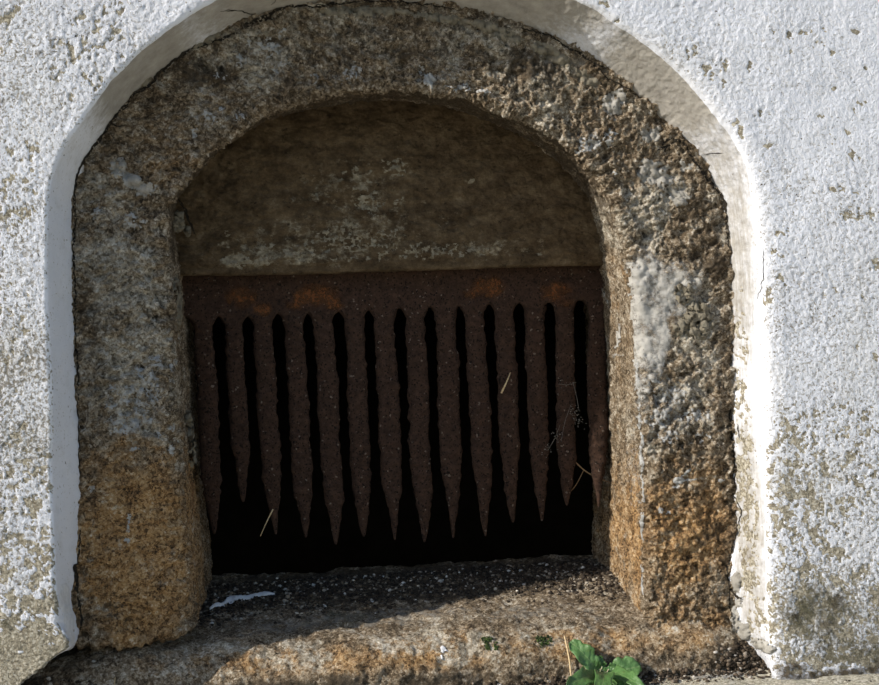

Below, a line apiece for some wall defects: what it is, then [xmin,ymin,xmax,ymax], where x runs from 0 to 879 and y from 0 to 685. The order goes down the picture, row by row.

peeling [0,4,21,54]
peeling [701,59,729,88]
peeling [786,27,836,56]
peeling [0,137,44,237]
peeling [840,206,875,223]
peeling [0,265,31,373]
peeling [718,305,879,679]
leakage [771,586,879,680]